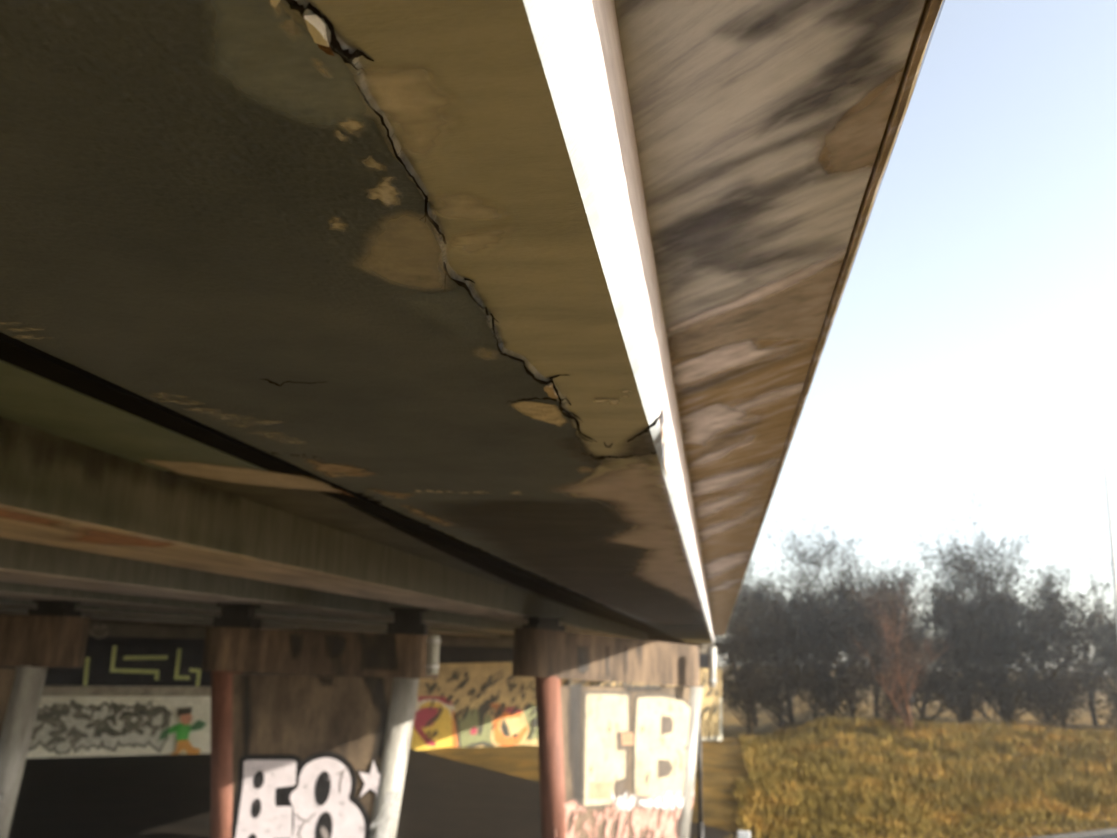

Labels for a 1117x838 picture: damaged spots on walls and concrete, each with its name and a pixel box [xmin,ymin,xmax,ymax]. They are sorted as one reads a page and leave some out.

crack [261,0,662,460]
spalling [512,402,566,426]
spalling [662,408,672,473]